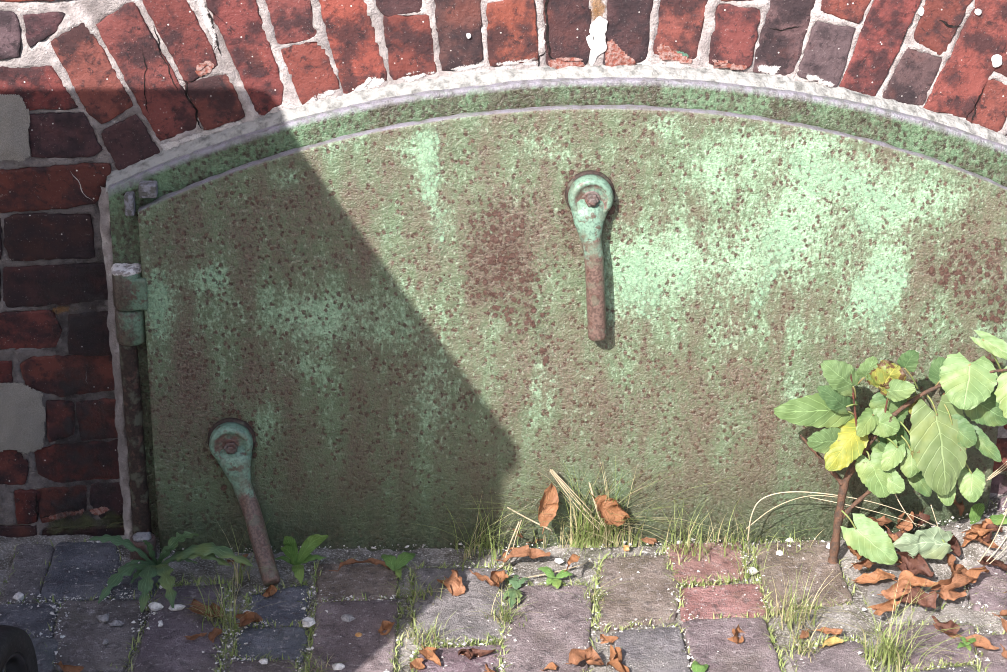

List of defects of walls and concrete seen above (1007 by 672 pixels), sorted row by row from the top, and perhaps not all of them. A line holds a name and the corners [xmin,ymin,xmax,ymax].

peeling [548,16,636,69]
rust [459,197,555,366]
rust [924,238,1007,336]